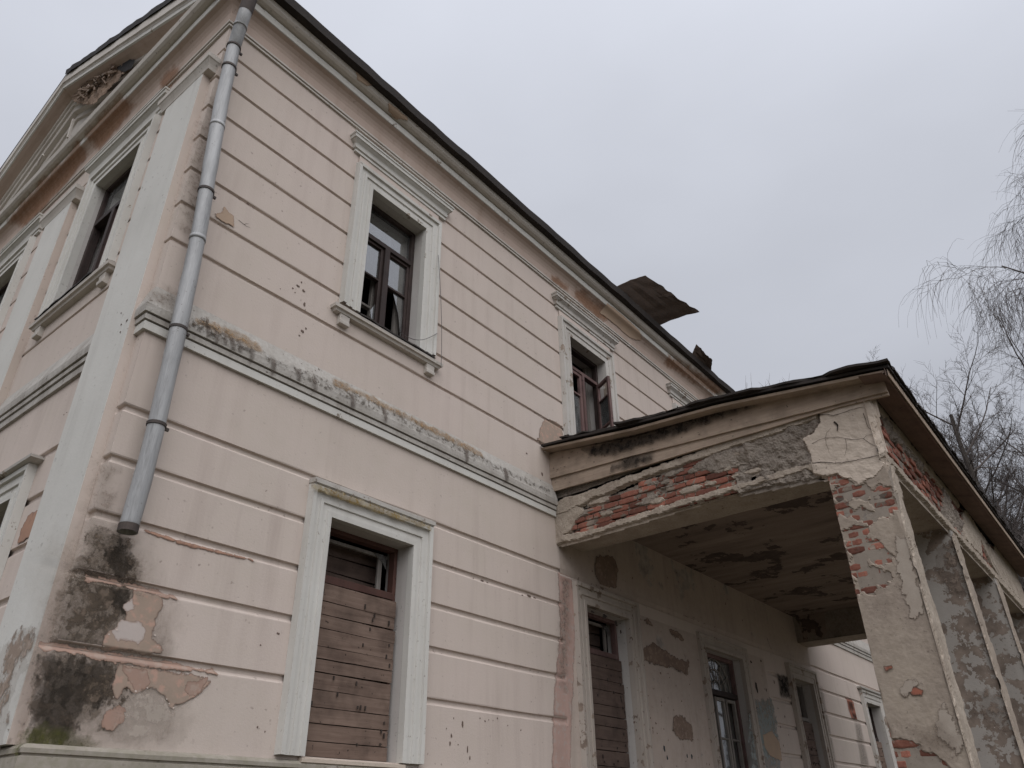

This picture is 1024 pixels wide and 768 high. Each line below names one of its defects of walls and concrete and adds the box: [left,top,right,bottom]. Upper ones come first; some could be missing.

water stain [192,317,547,491]
mould [26,527,142,738]
peeling [0,574,218,731]
peeling [145,529,255,562]
flaking render [570,414,973,768]